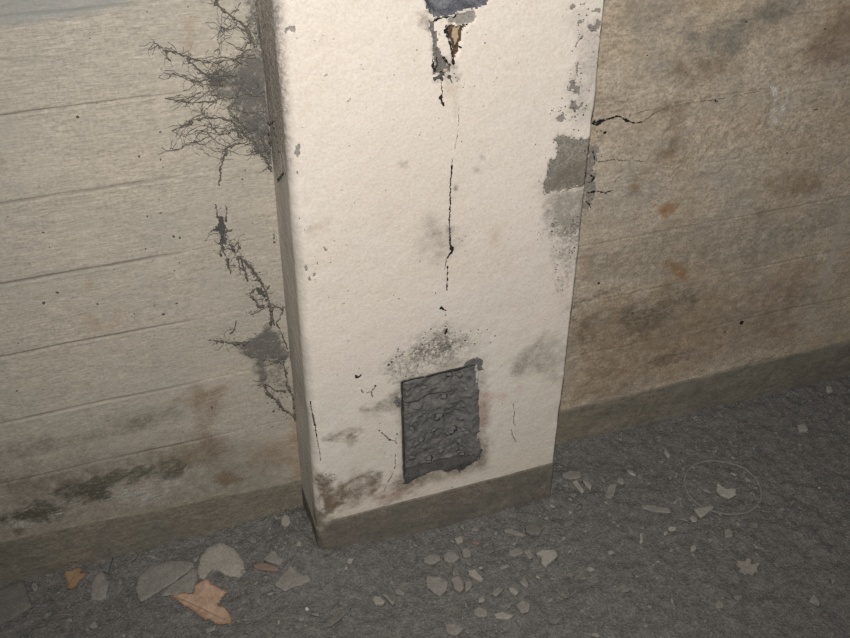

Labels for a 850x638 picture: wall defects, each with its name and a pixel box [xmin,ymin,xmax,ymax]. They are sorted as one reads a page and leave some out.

spalling [425,0,488,106]
peeling [570,3,601,53]
crack [585,91,758,208]
crack [444,109,459,290]
peeling [538,62,599,293]
spalling [463,357,484,371]
water stain [54,459,189,504]
water stain [315,473,381,528]
spalling [442,449,483,473]